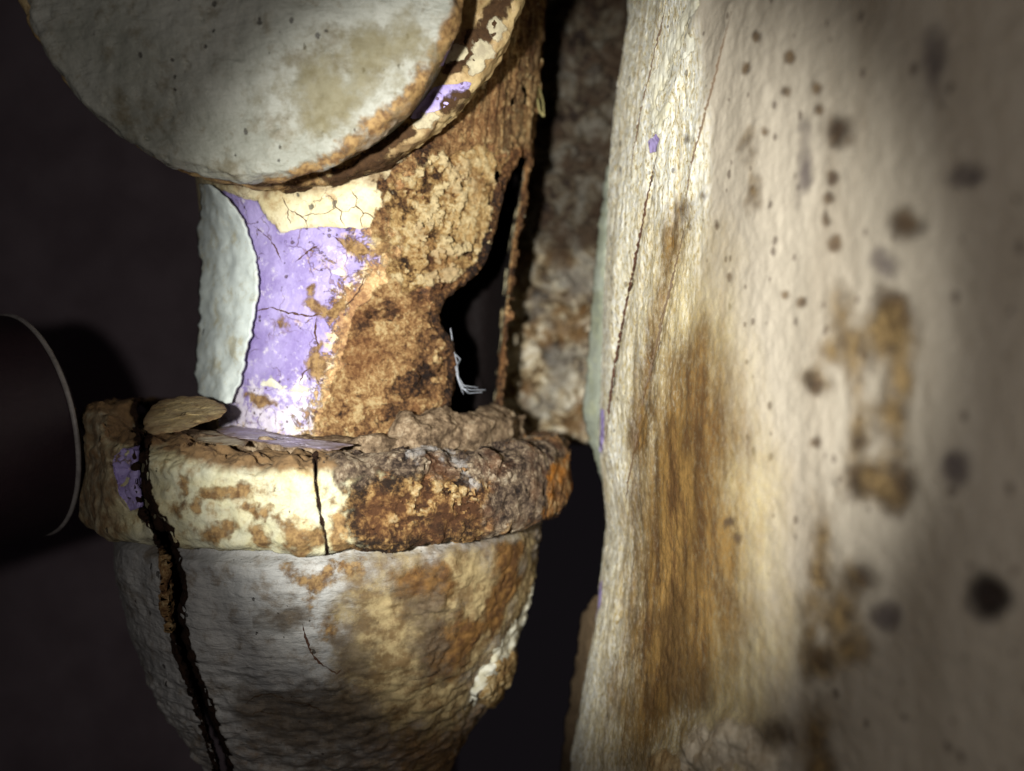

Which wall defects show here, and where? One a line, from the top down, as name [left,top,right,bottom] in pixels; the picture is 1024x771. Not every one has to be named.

rust [264,0,464,193]
water stain [828,120,849,145]
crack [256,307,322,346]
peeling [194,183,401,447]
crack [254,190,380,306]
rust [317,0,547,437]
water stain [824,291,911,447]
crack [312,451,330,555]
rust [543,450,572,520]
water stain [608,205,762,762]
water stain [851,463,913,507]
crack [130,397,234,771]